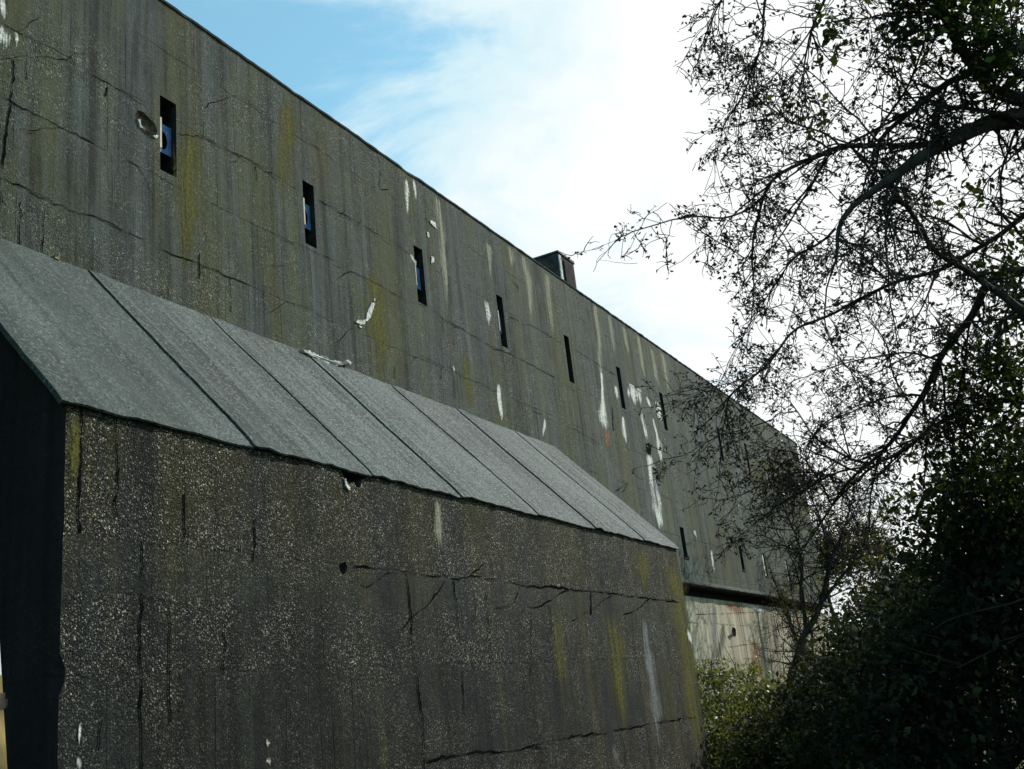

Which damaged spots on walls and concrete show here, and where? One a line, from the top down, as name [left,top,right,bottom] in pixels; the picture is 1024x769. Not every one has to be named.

spalling [135,110,159,139]
crack [1,17,575,391]
leakage [435,198,448,297]
leakage [509,248,532,314]
leakage [545,276,553,327]
crack [76,406,84,533]
leakage [594,306,669,526]
crack [75,542,172,769]
crack [354,563,768,769]
leakage [643,622,661,738]